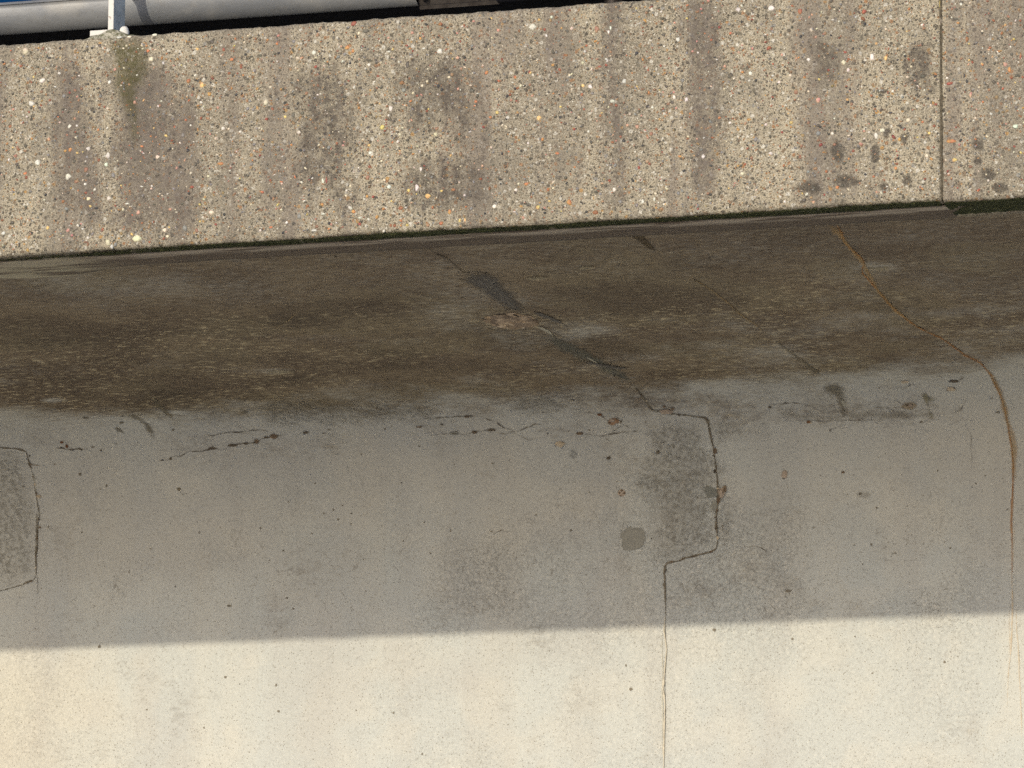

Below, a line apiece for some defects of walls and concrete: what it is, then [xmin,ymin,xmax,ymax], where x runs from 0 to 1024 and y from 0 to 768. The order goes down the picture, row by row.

crack [417,406,544,440]
crack [160,429,330,461]